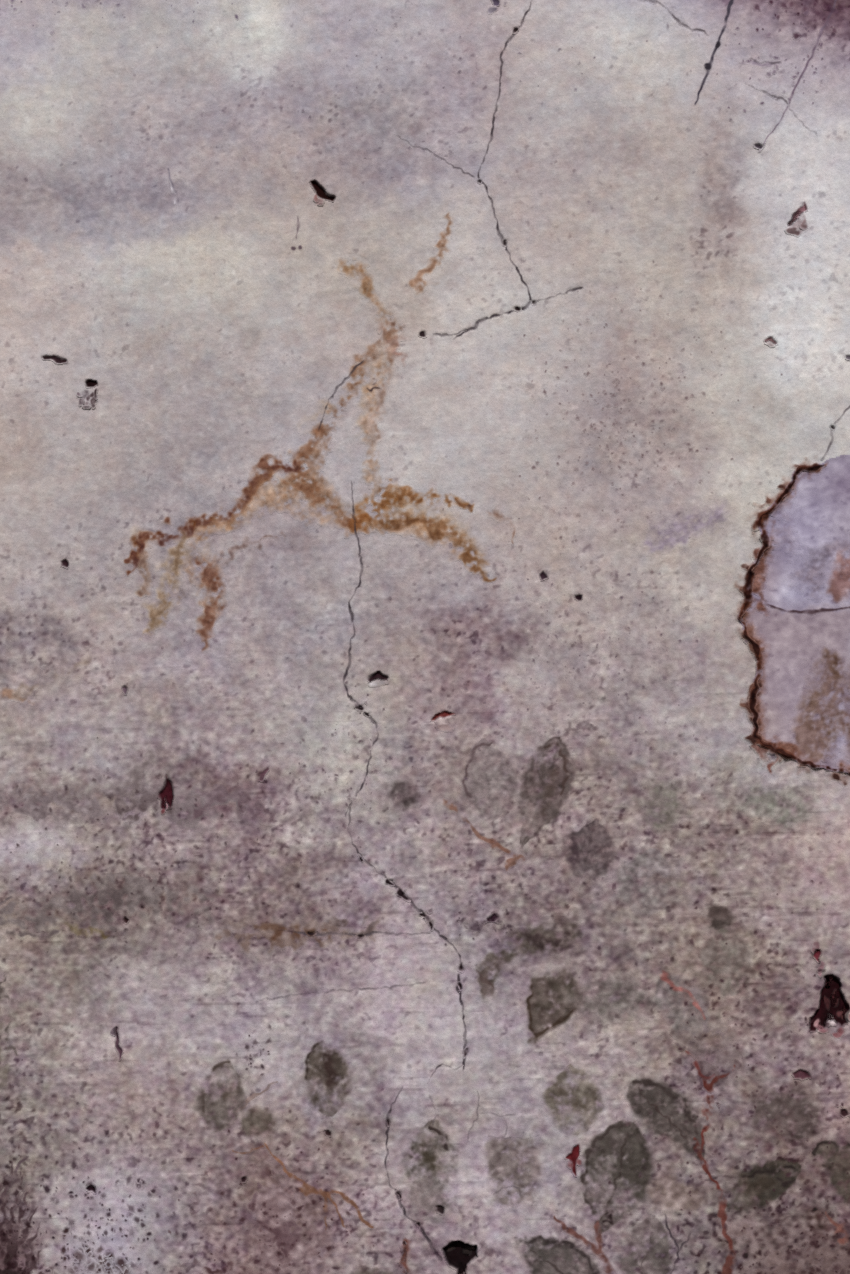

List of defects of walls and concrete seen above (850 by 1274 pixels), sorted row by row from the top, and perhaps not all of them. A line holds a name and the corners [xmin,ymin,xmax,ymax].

crack [397,0,584,340]
water stain [689,0,850,153]
crack [745,57,818,136]
rust [407,211,455,296]
rust [120,251,517,653]
crack [317,360,365,431]
peeling [733,454,850,786]
crack [259,480,539,1274]
water stain [235,1024,279,1113]
water stain [0,1126,389,1274]